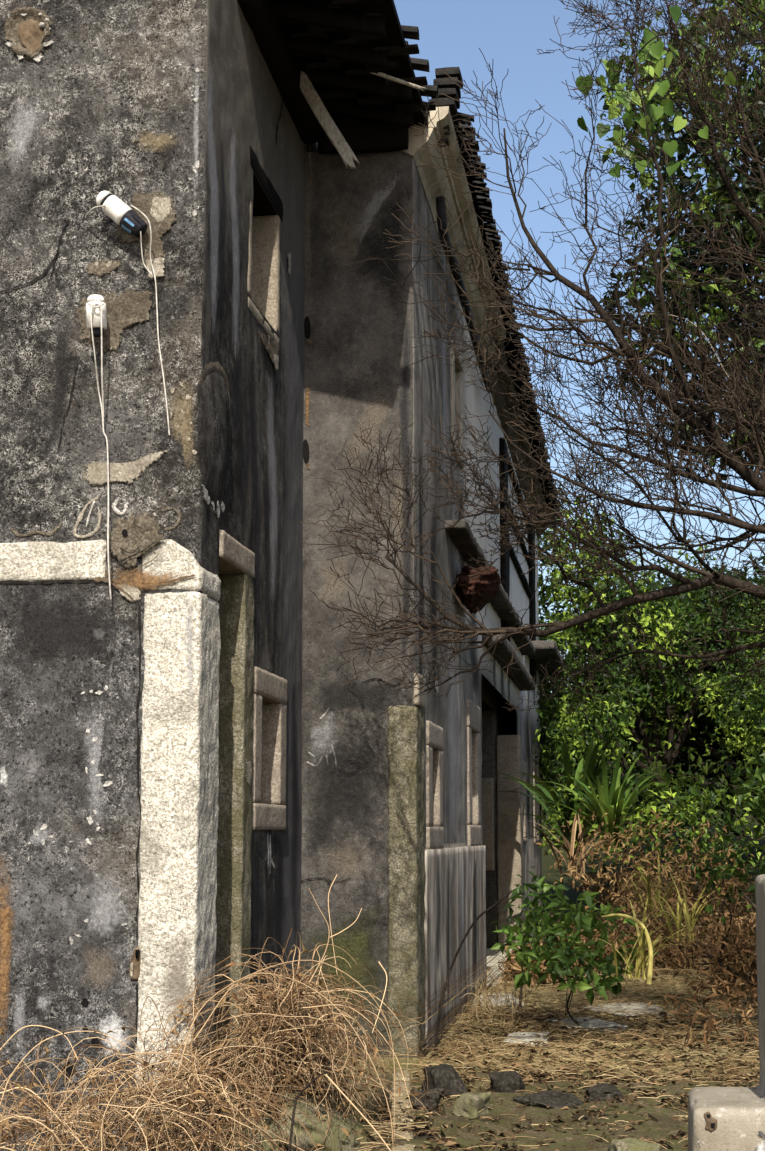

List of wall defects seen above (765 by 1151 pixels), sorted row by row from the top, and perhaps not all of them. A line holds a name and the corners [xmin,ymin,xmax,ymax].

spalling [4,7,54,63]
peeling [74,190,177,353]
peeling [82,450,167,485]
corrosion [118,570,175,588]
corrosion [0,886,12,1028]